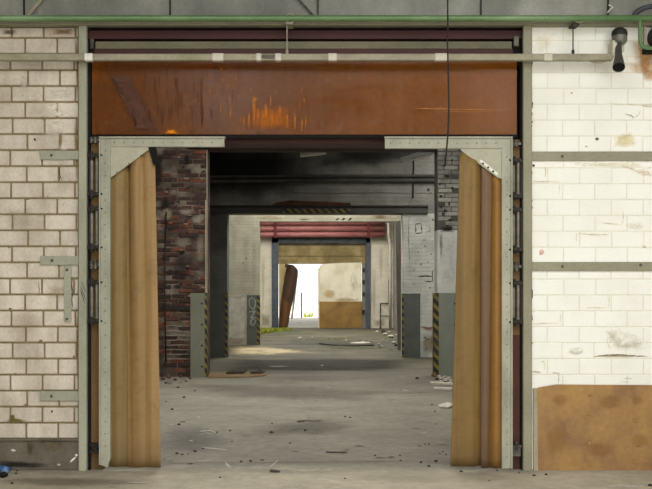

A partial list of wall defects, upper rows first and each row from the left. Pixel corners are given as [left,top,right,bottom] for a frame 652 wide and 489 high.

corrosion [636,45,652,78]
crack [594,351,647,359]